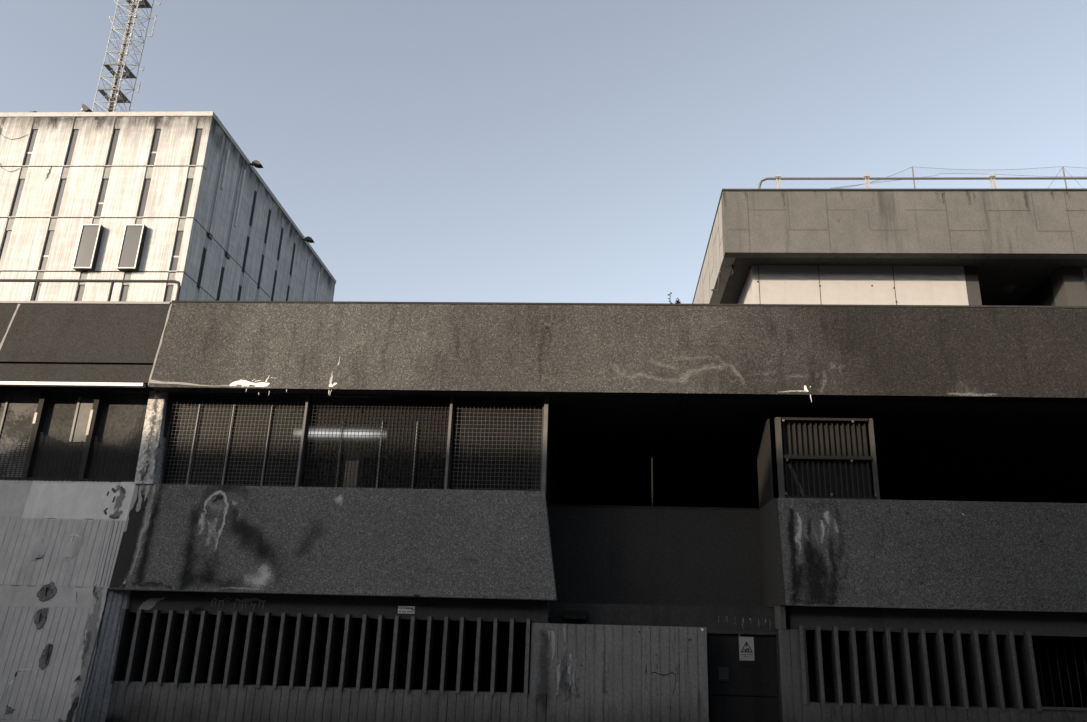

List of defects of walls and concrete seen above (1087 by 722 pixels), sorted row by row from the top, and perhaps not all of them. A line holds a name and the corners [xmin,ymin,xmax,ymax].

peeling [104,390,160,532]
leakage [180,485,274,589]
leakage [788,509,842,605]
spalling [34,581,57,630]
spalling [38,643,53,670]